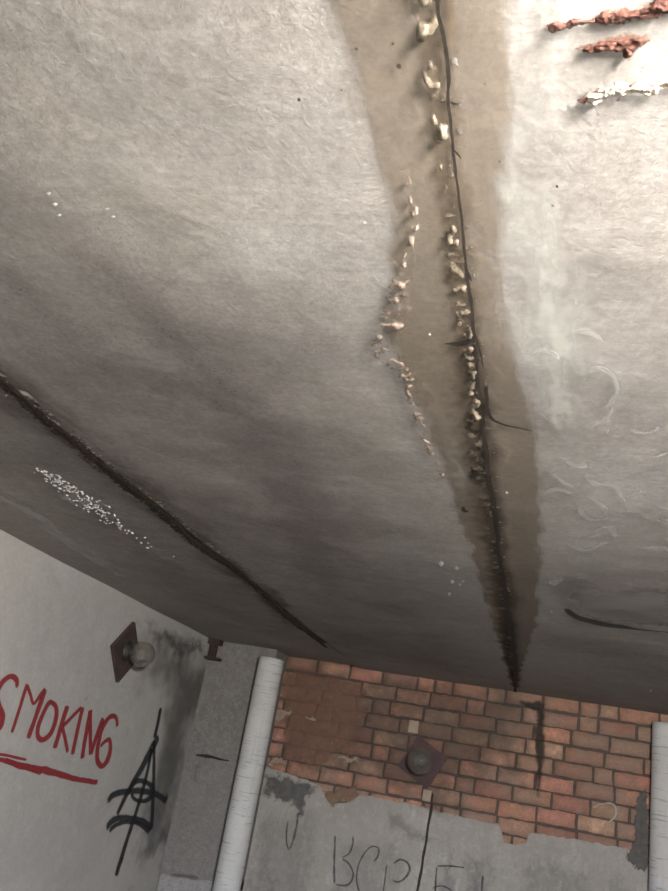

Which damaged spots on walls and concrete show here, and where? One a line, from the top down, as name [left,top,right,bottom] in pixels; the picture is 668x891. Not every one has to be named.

rust [547,0,668,33]
rust [582,36,650,59]
spalling [577,79,668,106]
damp [337,0,539,687]
crack [435,0,531,692]
damp [525,268,583,428]
crack [0,373,328,648]